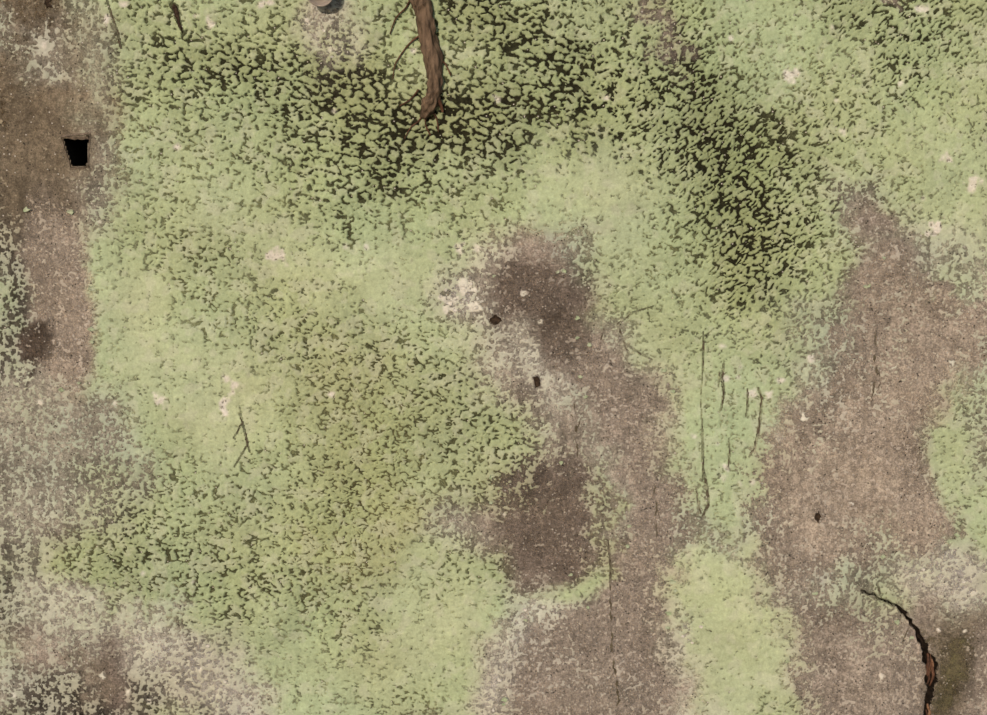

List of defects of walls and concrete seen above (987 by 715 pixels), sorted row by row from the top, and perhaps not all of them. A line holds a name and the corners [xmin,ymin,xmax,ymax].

crack [861,587,966,715]